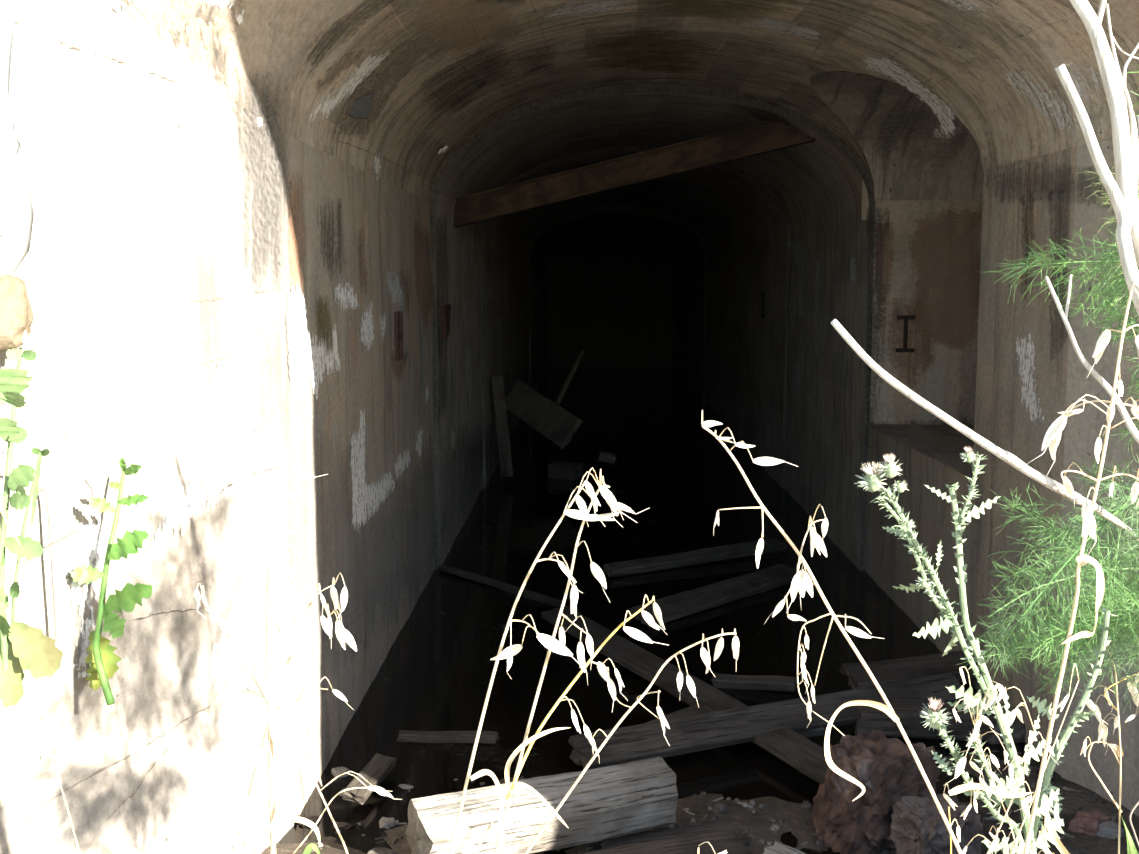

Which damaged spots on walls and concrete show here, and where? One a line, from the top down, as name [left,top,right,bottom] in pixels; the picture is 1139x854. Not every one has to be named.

crack [15,21,197,91]
spalling [123,0,273,136]
water stain [235,73,340,434]
water stain [334,271,406,349]
crack [128,609,197,621]